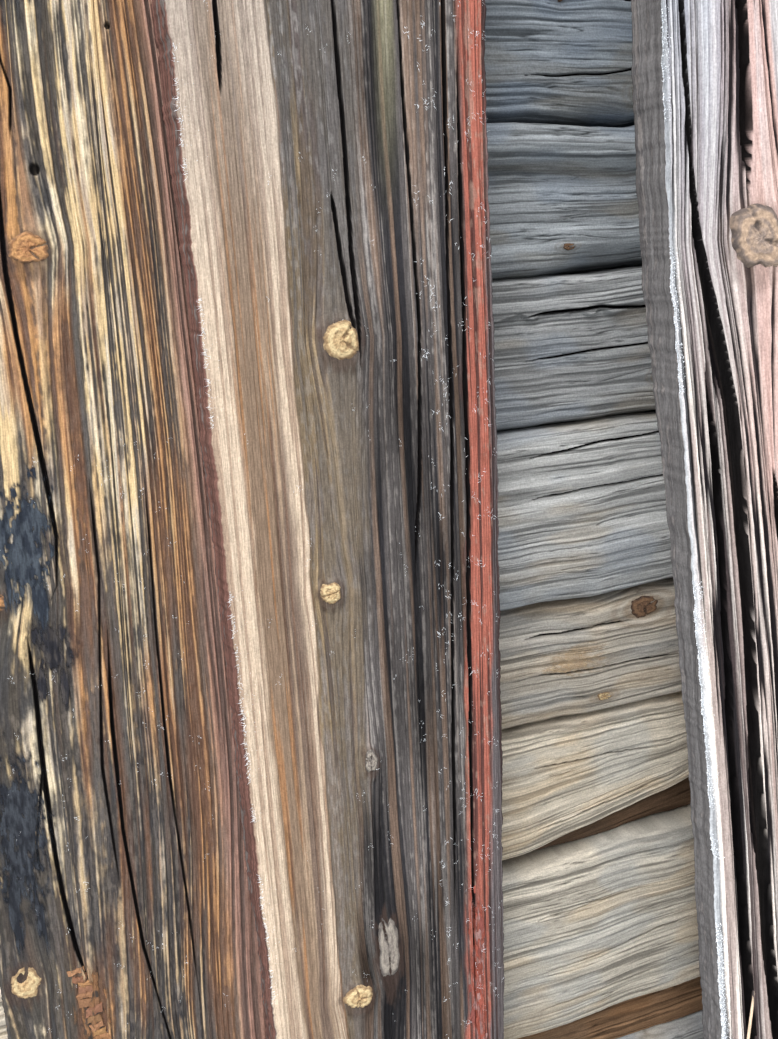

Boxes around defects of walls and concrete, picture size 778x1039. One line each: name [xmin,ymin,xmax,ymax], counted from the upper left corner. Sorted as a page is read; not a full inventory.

crack [212,0,220,86]
crack [28,644,86,972]